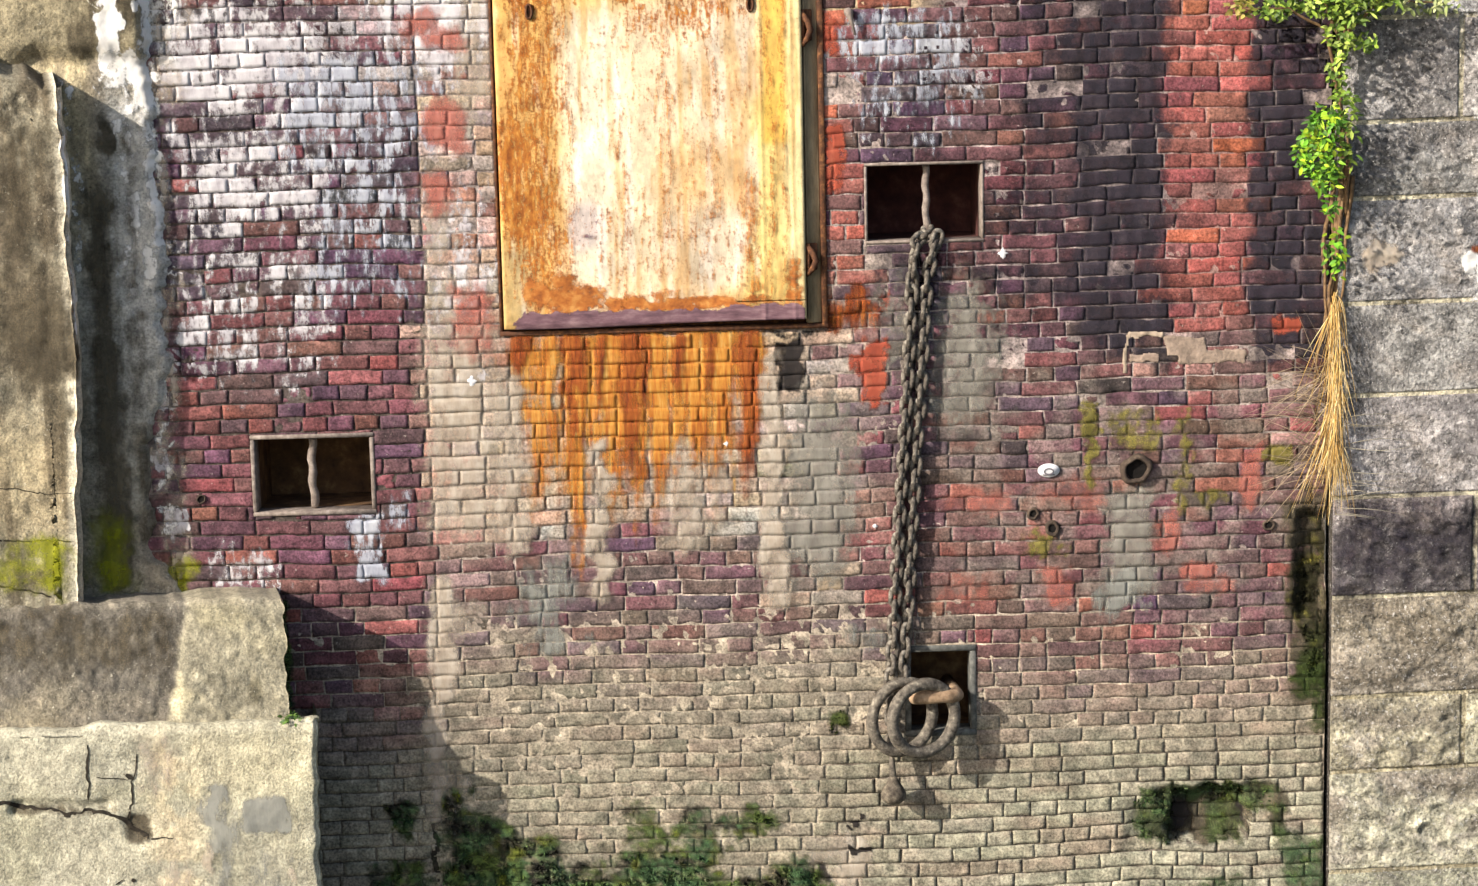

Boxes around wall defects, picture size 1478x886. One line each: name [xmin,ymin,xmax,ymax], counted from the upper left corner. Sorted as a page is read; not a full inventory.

rust [497,0,803,314]
leakage [0,0,530,591]
leakage [930,288,999,427]
leakage [586,440,615,597]
rust [510,330,769,569]
leakage [672,446,721,551]
leakage [759,359,856,608]
leakage [0,607,169,665]
leakage [520,567,575,654]
crack [0,744,174,843]